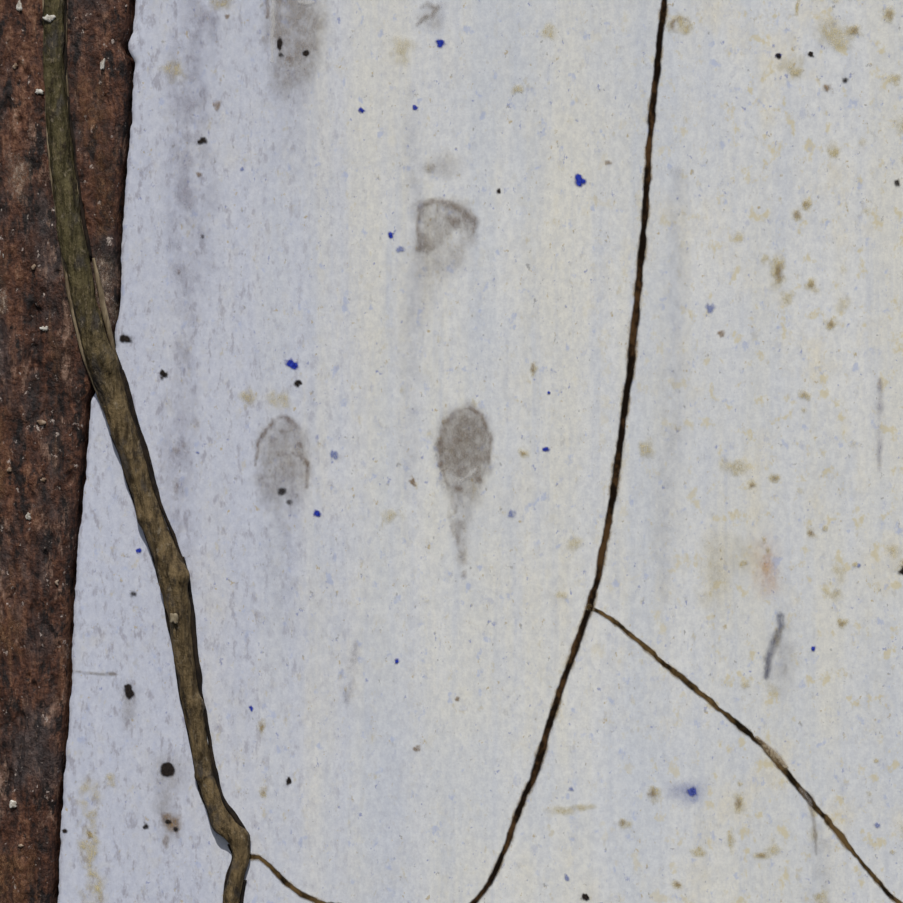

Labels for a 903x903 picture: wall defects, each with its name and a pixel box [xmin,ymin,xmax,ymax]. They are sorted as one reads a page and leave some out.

water stain [272,0,318,69]
crack [470,0,902,903]
crack [250,854,333,903]